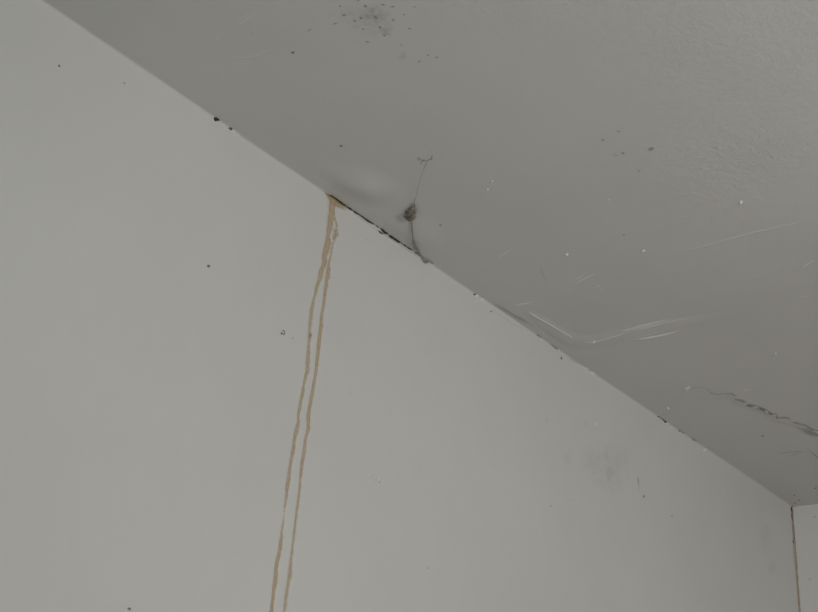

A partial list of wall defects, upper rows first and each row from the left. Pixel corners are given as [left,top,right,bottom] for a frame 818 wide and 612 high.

crack [328,194,423,262]
water stain [284,197,343,611]
water stain [270,526,283,612]